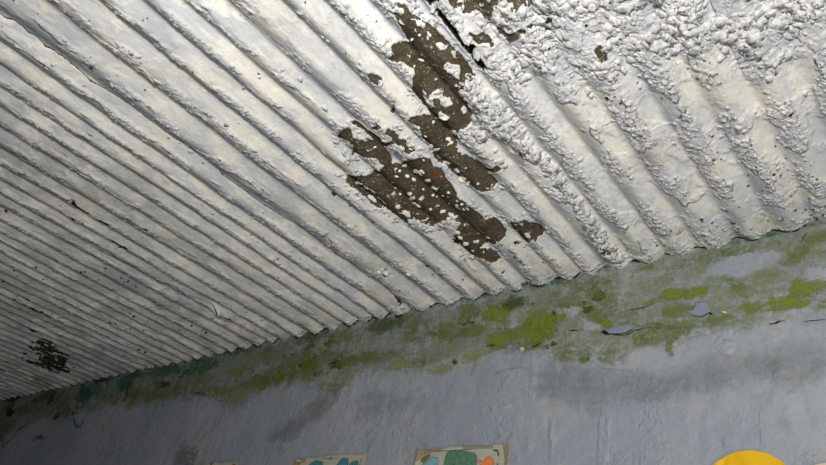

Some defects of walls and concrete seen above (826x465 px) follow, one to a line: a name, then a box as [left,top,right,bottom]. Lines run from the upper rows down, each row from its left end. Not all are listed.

crack [1,14,181,142]
peeling [329,0,826,281]
peeling [18,328,79,373]